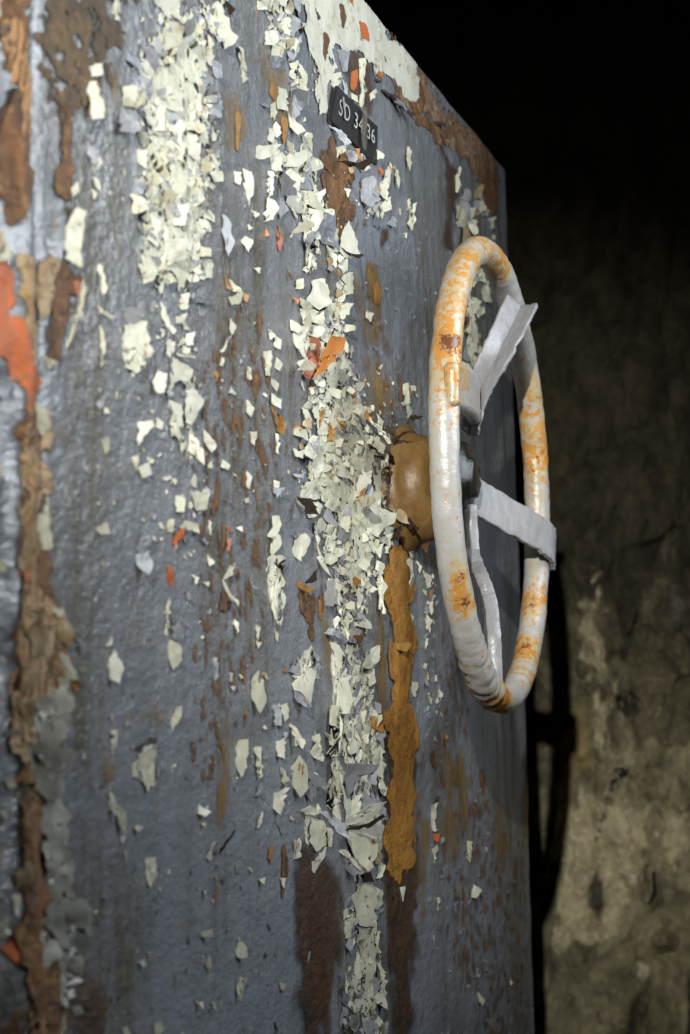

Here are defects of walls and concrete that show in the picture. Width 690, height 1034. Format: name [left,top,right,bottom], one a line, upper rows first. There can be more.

peeling [0,68,12,94]
rust [0,0,139,370]
rust [378,56,501,251]
peeling [0,230,106,1034]
peeling [76,0,423,1034]
rust [292,533,310,561]
rust [297,581,330,661]
peeling [412,542,452,773]
rust [378,545,529,1034]
peeling [428,796,517,911]